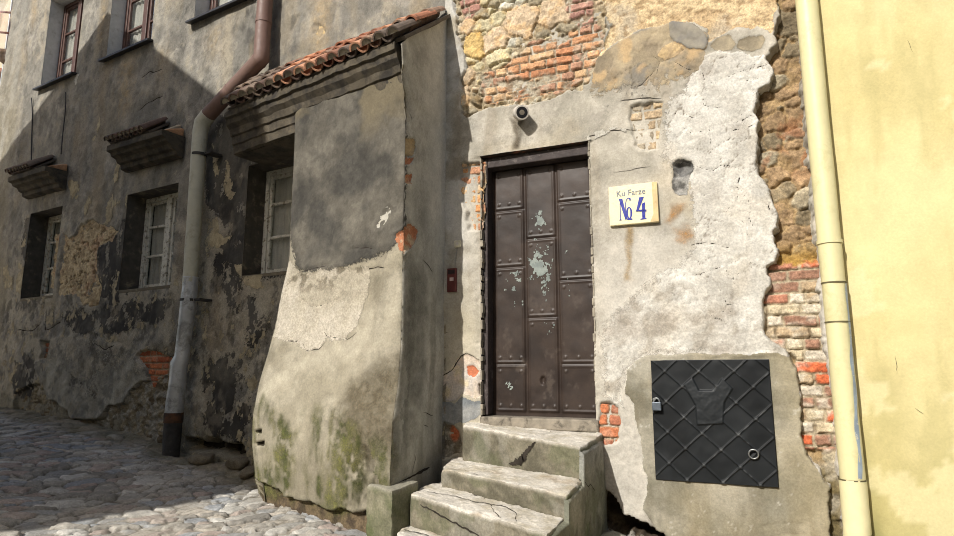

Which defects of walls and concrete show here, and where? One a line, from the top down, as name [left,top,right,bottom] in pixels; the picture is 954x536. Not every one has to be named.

crack [622,56,764,144]
flaking render [0,162,175,416]
peeling [224,263,264,290]
peeling [233,260,370,391]
flaking render [453,0,843,536]
crack [693,165,770,320]
flaking render [90,346,172,443]
damp [344,370,393,453]
flaking render [442,424,463,457]
flaking render [443,354,483,401]
crack [509,431,551,466]
crack [399,457,517,536]